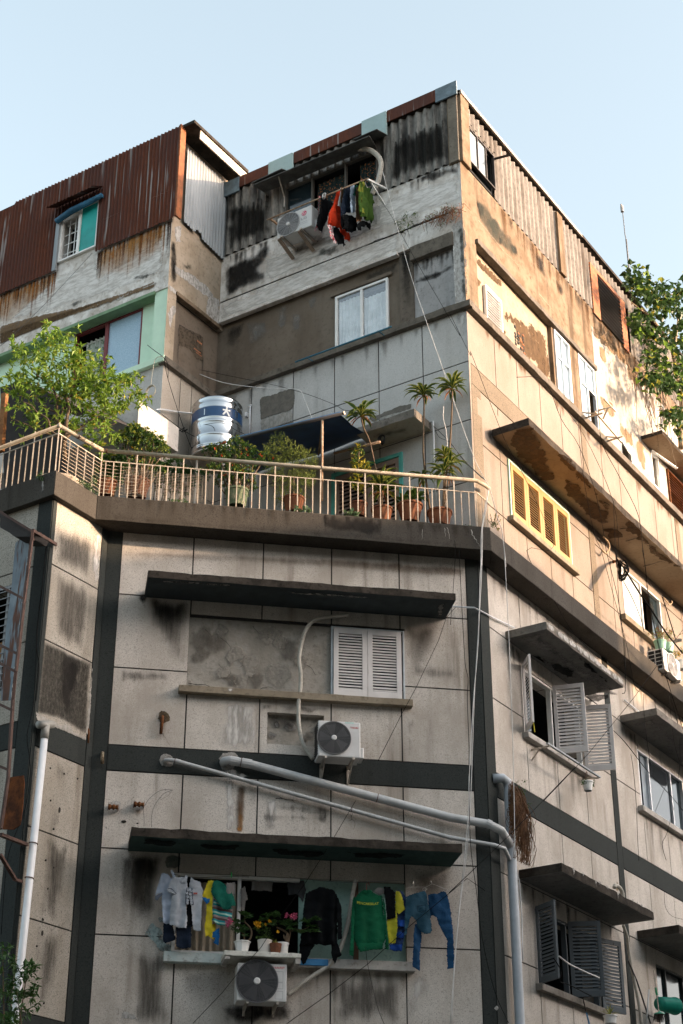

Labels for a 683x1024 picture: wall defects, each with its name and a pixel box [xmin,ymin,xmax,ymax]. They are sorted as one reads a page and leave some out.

leakage [392,120,458,181]
corrosion [97,221,172,275]
leakage [167,195,268,327]
corrosion [0,272,56,318]
spalling [178,326,204,361]
peeling [503,312,550,377]
leakage [61,534,101,578]
leakage [39,645,89,730]
leakage [125,859,156,909]